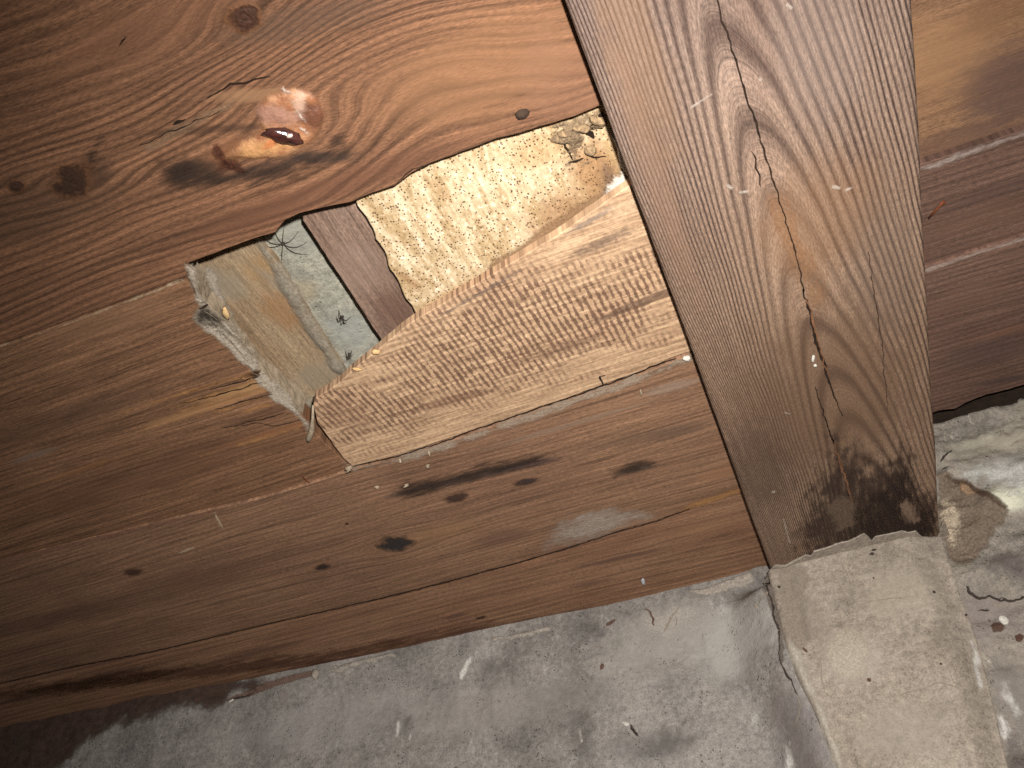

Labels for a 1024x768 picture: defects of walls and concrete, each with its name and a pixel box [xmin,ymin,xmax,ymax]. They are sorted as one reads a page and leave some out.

damp [400,457,542,496]
damp [620,461,653,474]
damp [804,447,936,555]
crack [758,575,801,724]